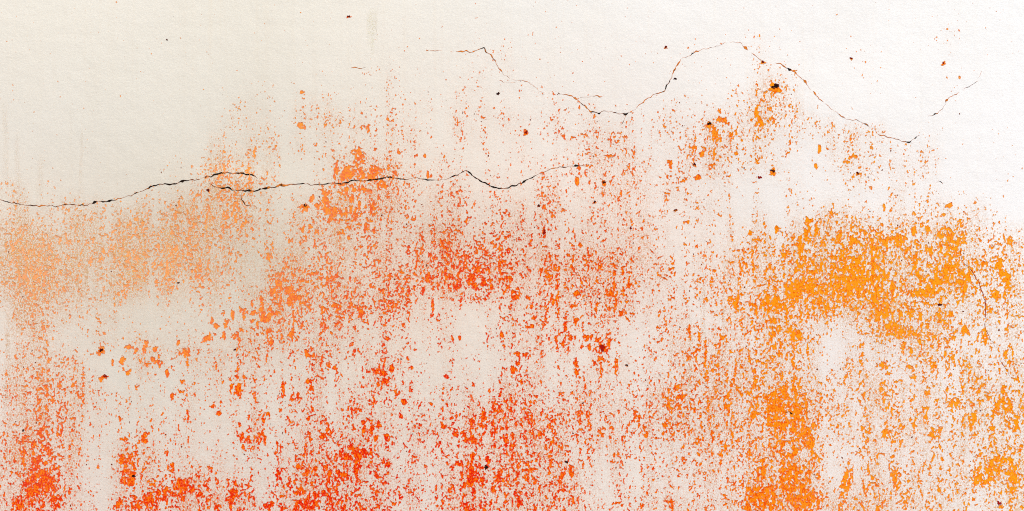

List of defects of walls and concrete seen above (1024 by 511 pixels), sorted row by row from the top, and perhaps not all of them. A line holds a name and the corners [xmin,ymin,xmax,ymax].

crack [426,42,982,143]
crack [0,164,582,208]
peeling [203,151,423,257]
peeling [87,271,305,408]